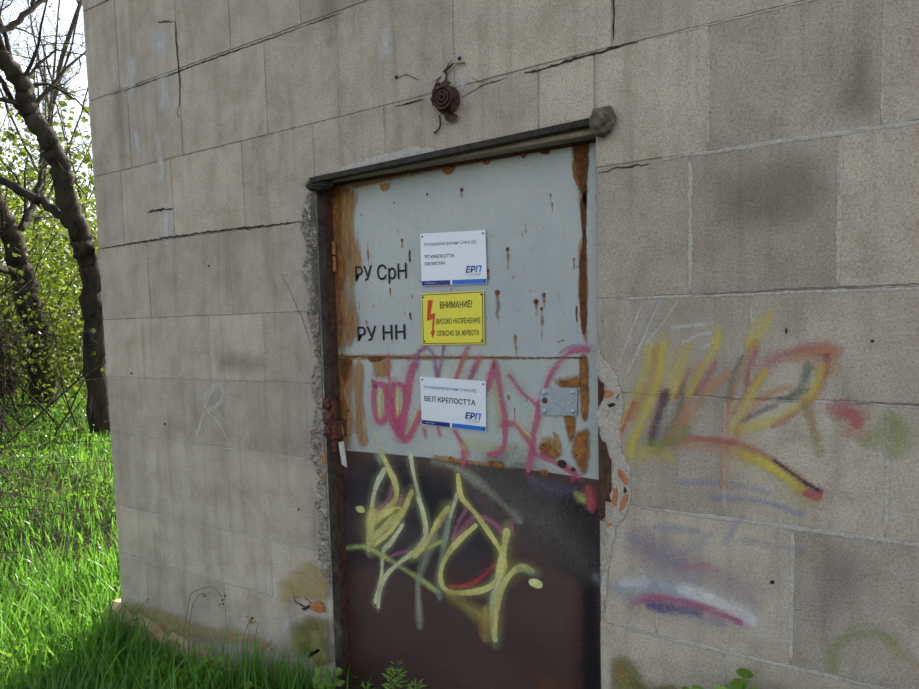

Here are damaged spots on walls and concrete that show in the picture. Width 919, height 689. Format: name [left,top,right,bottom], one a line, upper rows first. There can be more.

crack [396,73,439,107]
crack [462,0,637,97]
spalling [300,190,331,586]
peeling [338,441,347,467]
corrosion [332,153,526,450]
corrosion [531,354,589,473]
corrosion [572,143,590,341]
spalling [595,350,632,612]